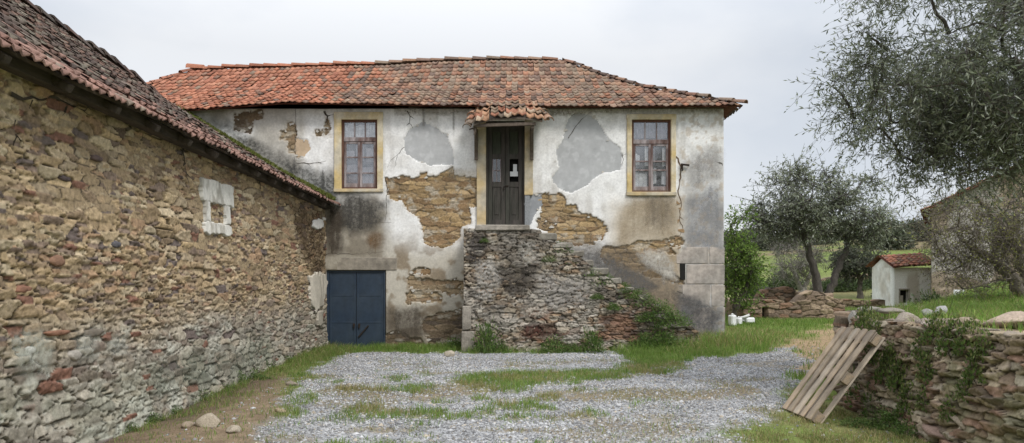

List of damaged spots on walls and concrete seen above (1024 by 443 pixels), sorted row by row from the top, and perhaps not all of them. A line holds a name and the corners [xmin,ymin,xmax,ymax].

spalling [234,109,264,134]
damp [226,125,384,272]
spalling [280,119,331,158]
spalling [385,122,477,248]
peeling [524,112,685,285]
crack [675,156,684,250]
spalling [386,267,464,346]